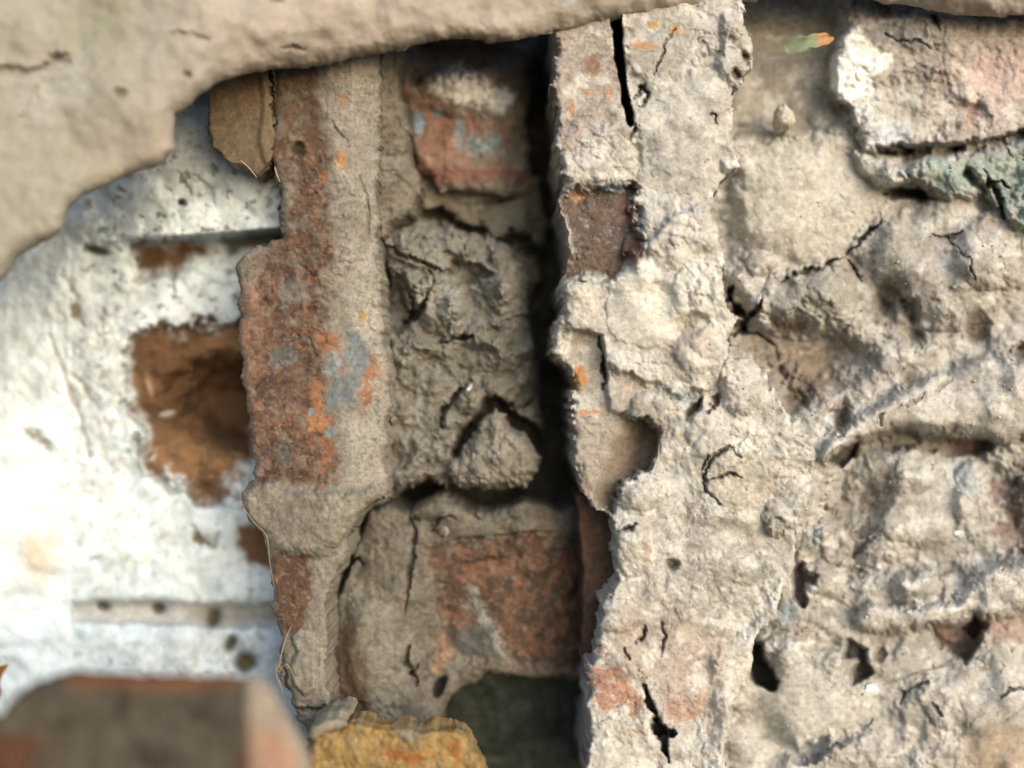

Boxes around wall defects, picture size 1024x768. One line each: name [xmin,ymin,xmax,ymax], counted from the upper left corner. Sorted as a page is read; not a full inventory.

crack [610,19,671,140]
rust [403,80,527,193]
spalling [126,229,283,286]
rust [237,66,352,491]
crack [725,285,759,335]
spalling [116,288,255,510]
spalling [450,395,544,458]
spalling [572,411,690,514]
crack [699,444,742,506]
rust [268,549,315,654]
rust [416,517,651,738]
crack [642,683,678,763]